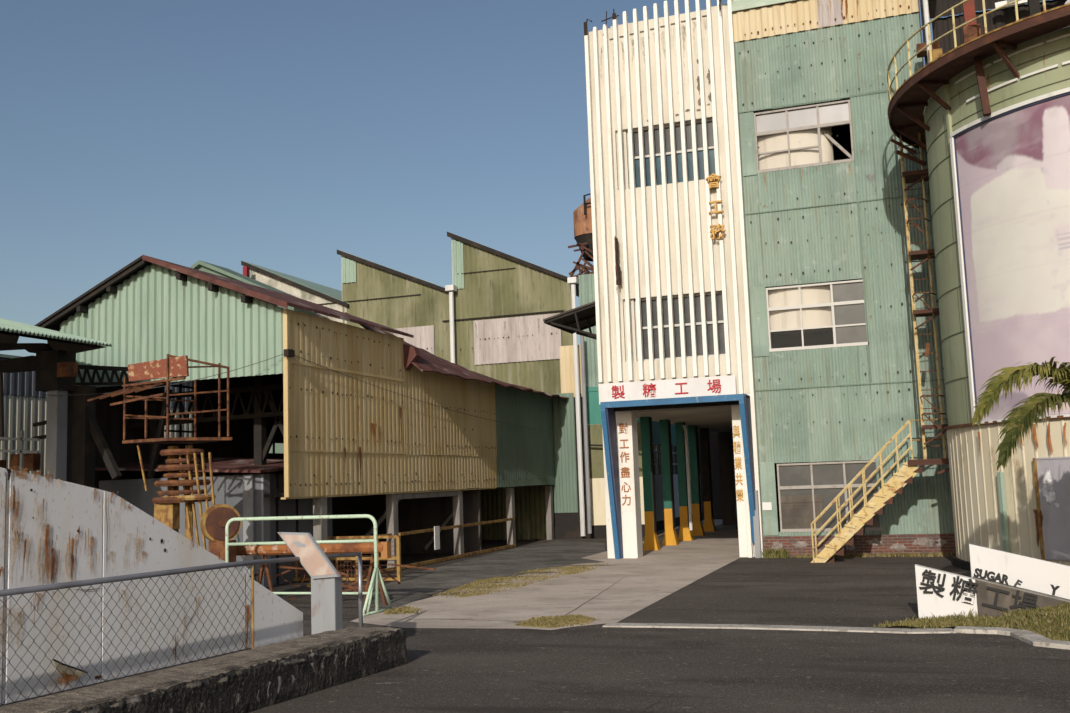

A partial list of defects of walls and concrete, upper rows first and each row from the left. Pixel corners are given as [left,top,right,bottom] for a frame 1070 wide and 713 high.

corrosion [0,467,97,644]